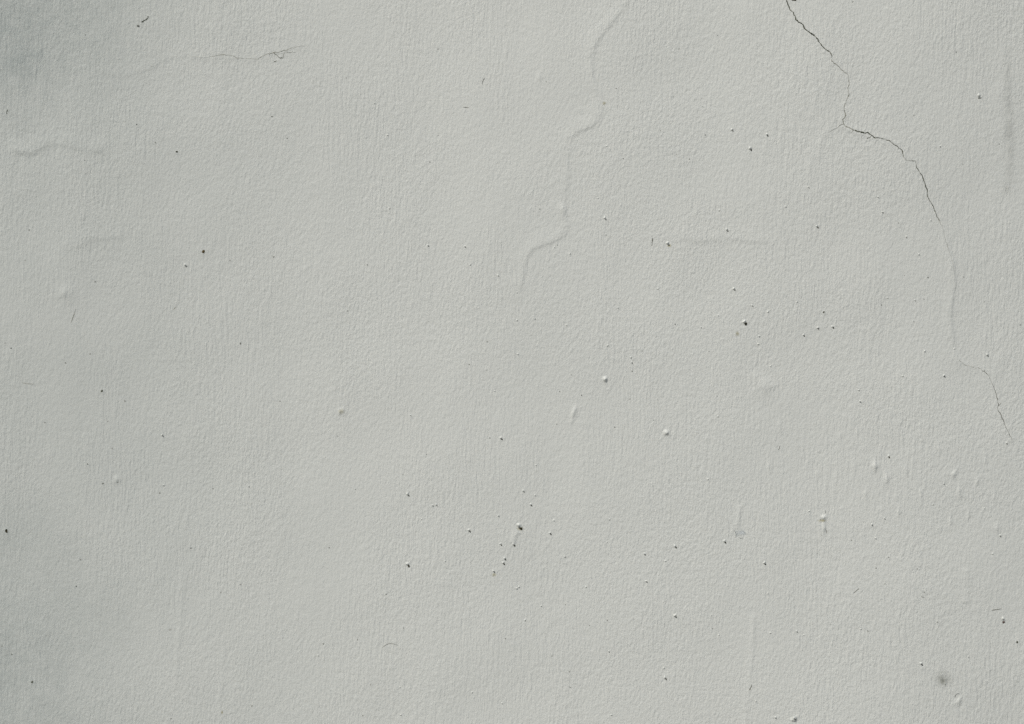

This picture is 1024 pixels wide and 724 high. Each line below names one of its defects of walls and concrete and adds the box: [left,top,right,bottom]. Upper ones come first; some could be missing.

crack [781,0,940,222]